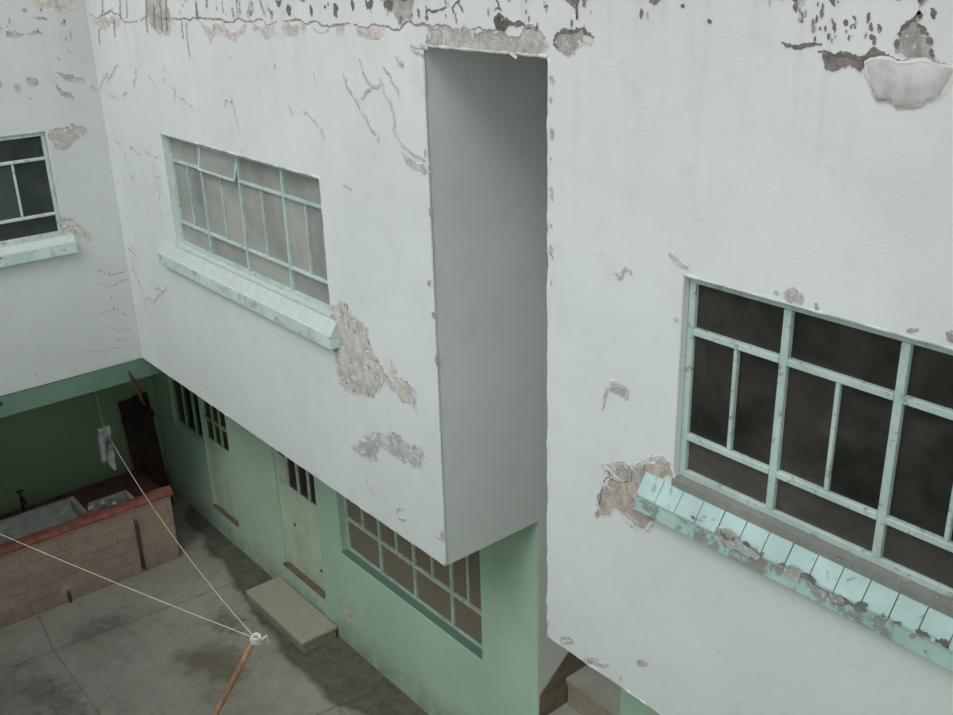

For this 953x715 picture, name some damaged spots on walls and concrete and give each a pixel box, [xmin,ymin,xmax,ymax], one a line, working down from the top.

crack [89,0,505,33]
flaking render [412,0,595,64]
crack [553,0,593,48]
flaking render [769,0,891,74]
peeling [47,123,88,151]
peeling [331,302,417,412]
peeling [350,431,424,467]
peeling [593,453,675,531]
flaking render [715,527,764,560]
flaking render [776,560,868,612]
peeling [915,629,950,649]